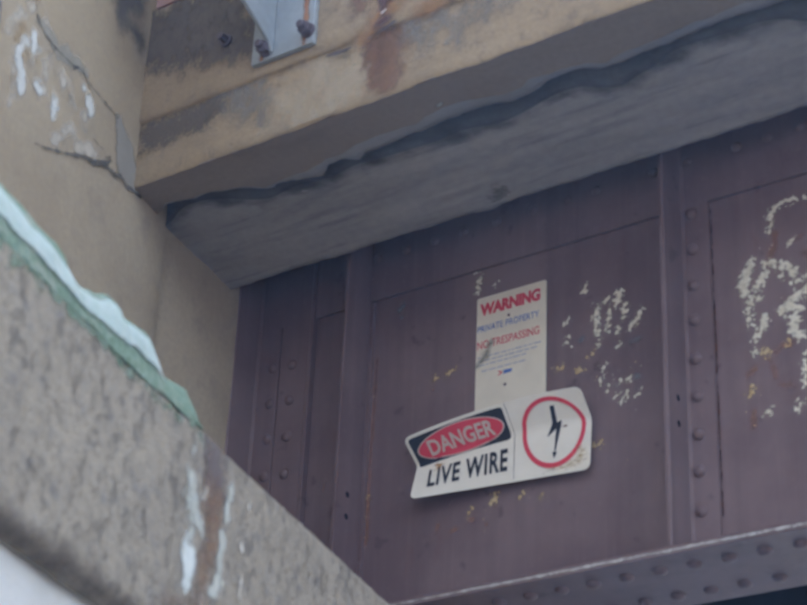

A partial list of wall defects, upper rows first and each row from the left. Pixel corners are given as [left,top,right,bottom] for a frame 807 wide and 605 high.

crack [37,14,118,118]
corrosion [365,0,403,94]
spalling [158,0,807,225]
crack [42,146,141,198]